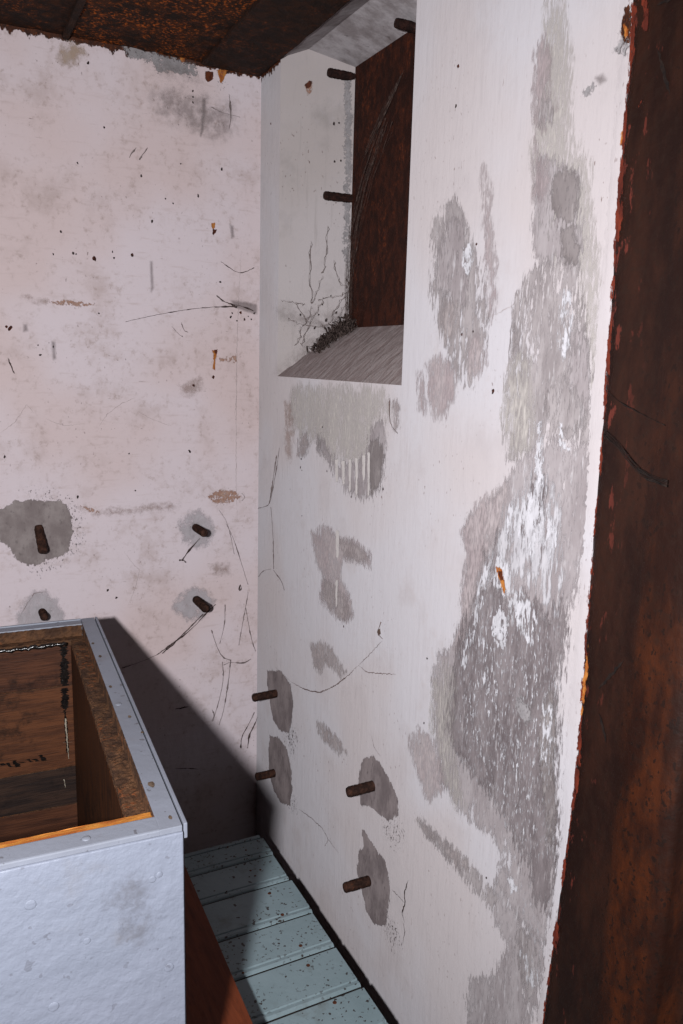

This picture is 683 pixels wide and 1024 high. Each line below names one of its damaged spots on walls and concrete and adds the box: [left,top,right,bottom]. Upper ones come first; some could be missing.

damp [289,382,400,504]
peeling [179,511,214,547]
damp [408,3,601,1024]
peeling [18,592,64,625]
peeling [174,588,214,619]
damp [311,523,372,621]
rust [496,567,506,593]
crack [285,642,392,693]
rust [580,657,588,715]